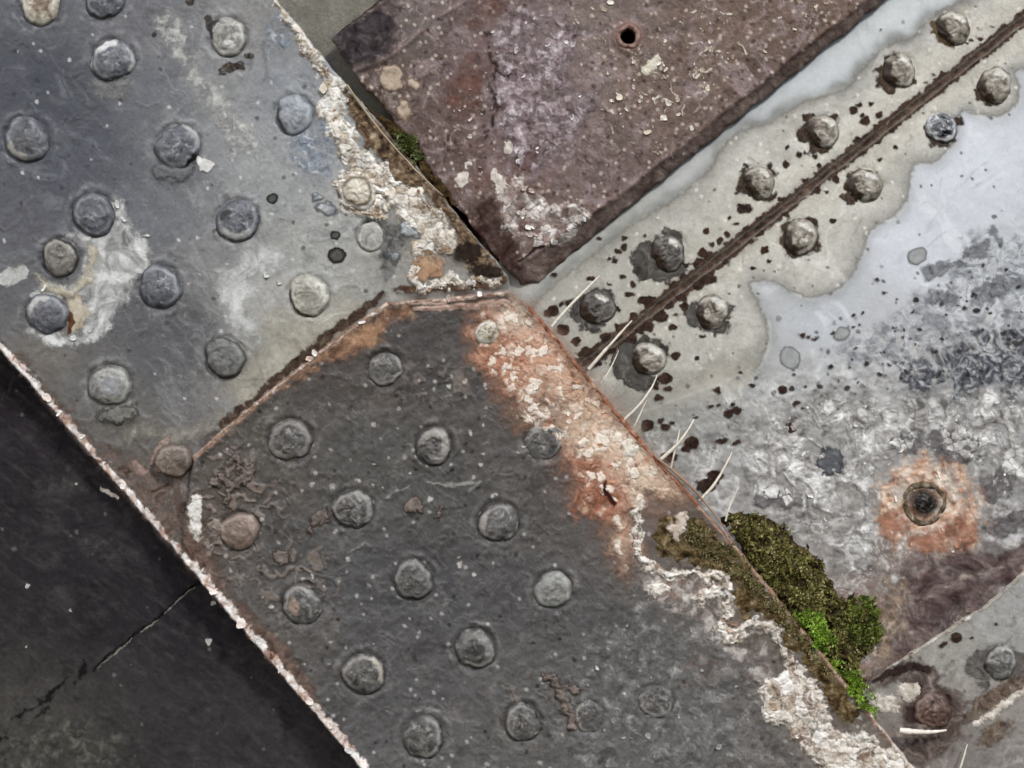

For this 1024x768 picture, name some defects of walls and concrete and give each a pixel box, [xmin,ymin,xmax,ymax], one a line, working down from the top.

rust [282,304,412,389]
rust [463,9,1024,581]
crack [0,581,201,741]
peeling [0,343,369,768]
rust [865,449,1024,763]